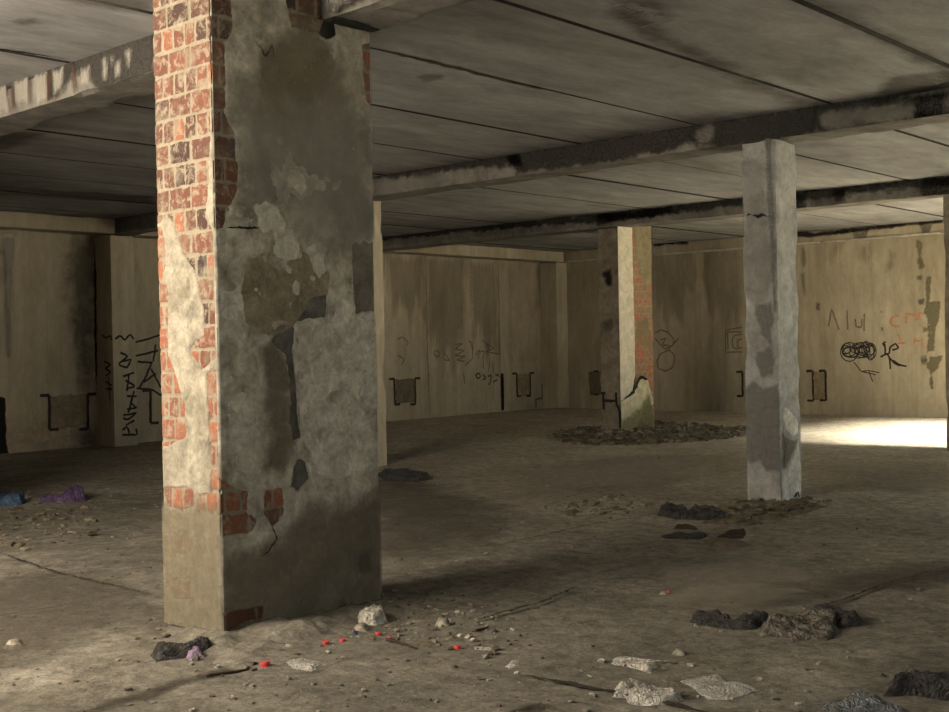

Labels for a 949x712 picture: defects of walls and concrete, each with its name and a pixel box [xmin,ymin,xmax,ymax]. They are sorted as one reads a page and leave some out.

flaking render [153,0,380,536]
flaking render [621,227,654,428]
flaking render [222,606,263,631]